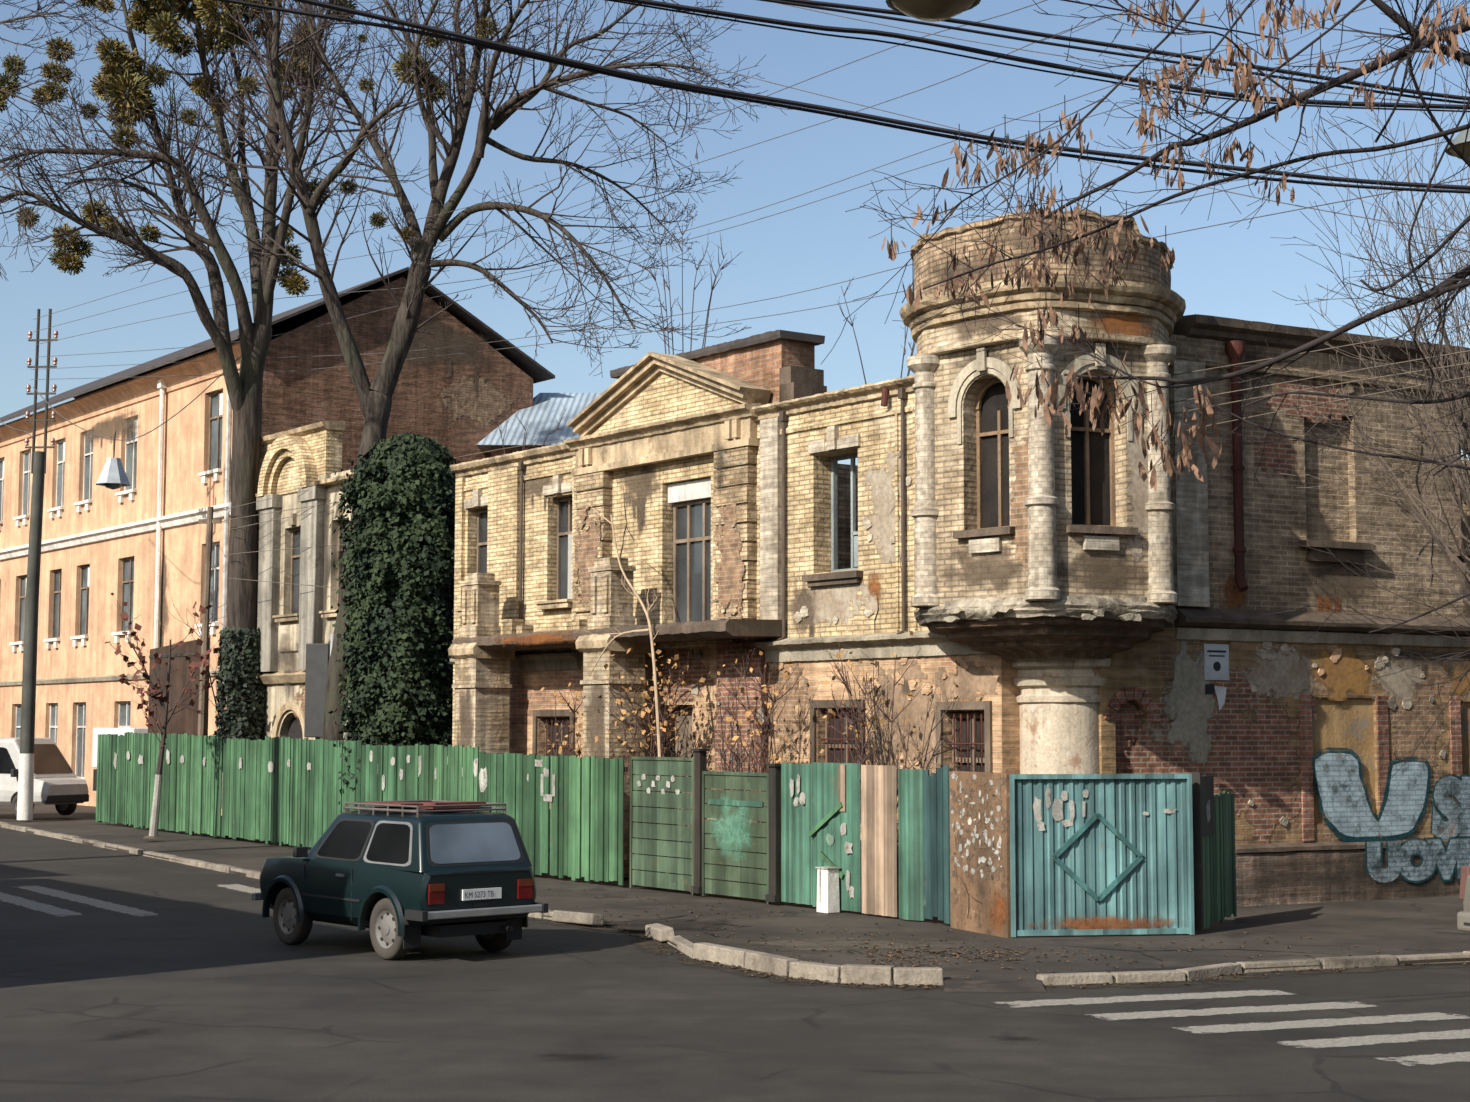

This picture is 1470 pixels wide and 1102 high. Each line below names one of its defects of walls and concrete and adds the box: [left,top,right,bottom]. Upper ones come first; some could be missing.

peeling [793,583,878,626]
spalling [1124,642,1470,844]
rust [1058,917,1170,930]